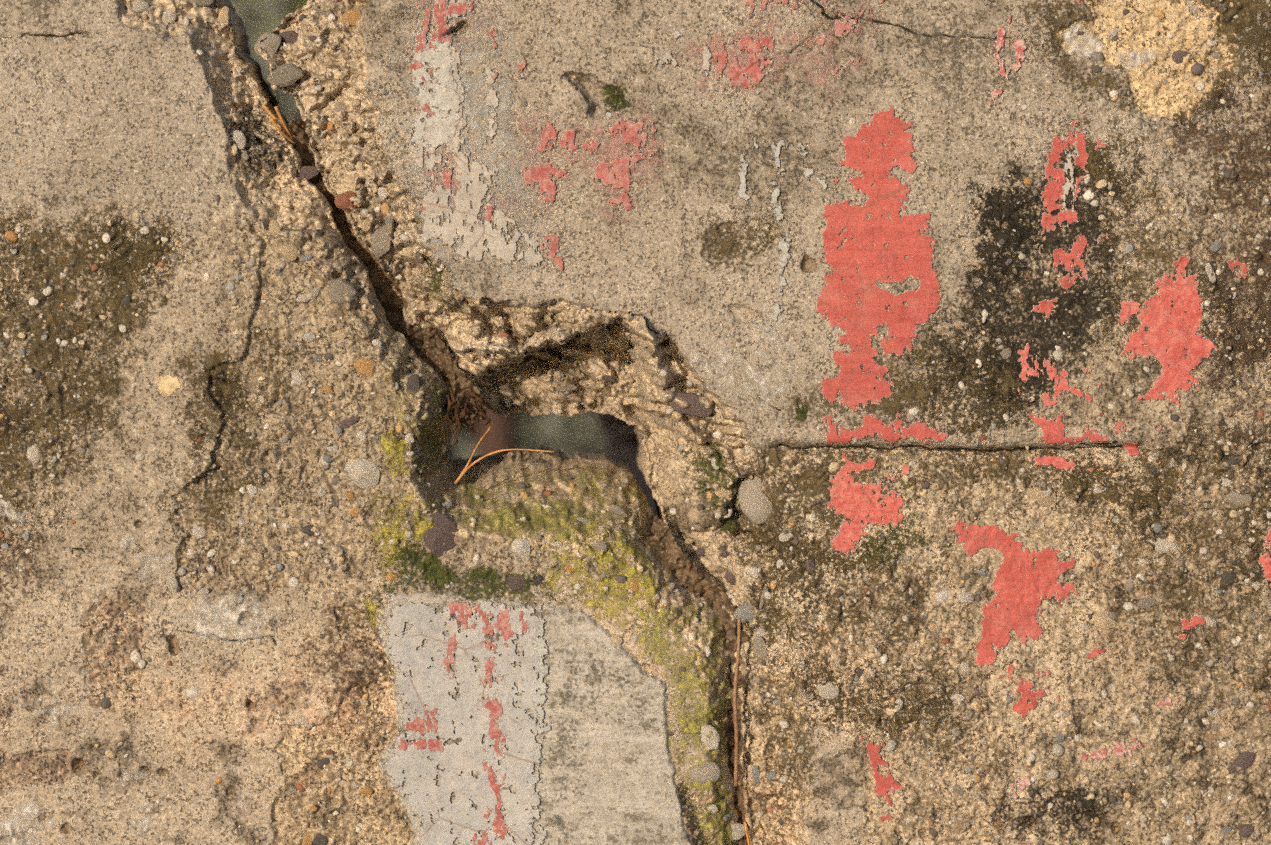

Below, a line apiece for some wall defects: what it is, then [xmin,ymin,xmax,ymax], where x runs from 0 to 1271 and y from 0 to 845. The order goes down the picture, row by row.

crack [761,0,1015,64]
spalling [1049,0,1239,122]
peeling [797,143,841,192]
crack [289,117,487,424]
peeling [1031,298,1058,318]
damp [0,196,188,617]
spalling [116,0,818,845]
crack [779,441,1138,453]
damp [688,0,1271,845]
crack [644,507,754,845]
damp [549,721,588,796]
damp [677,782,709,845]